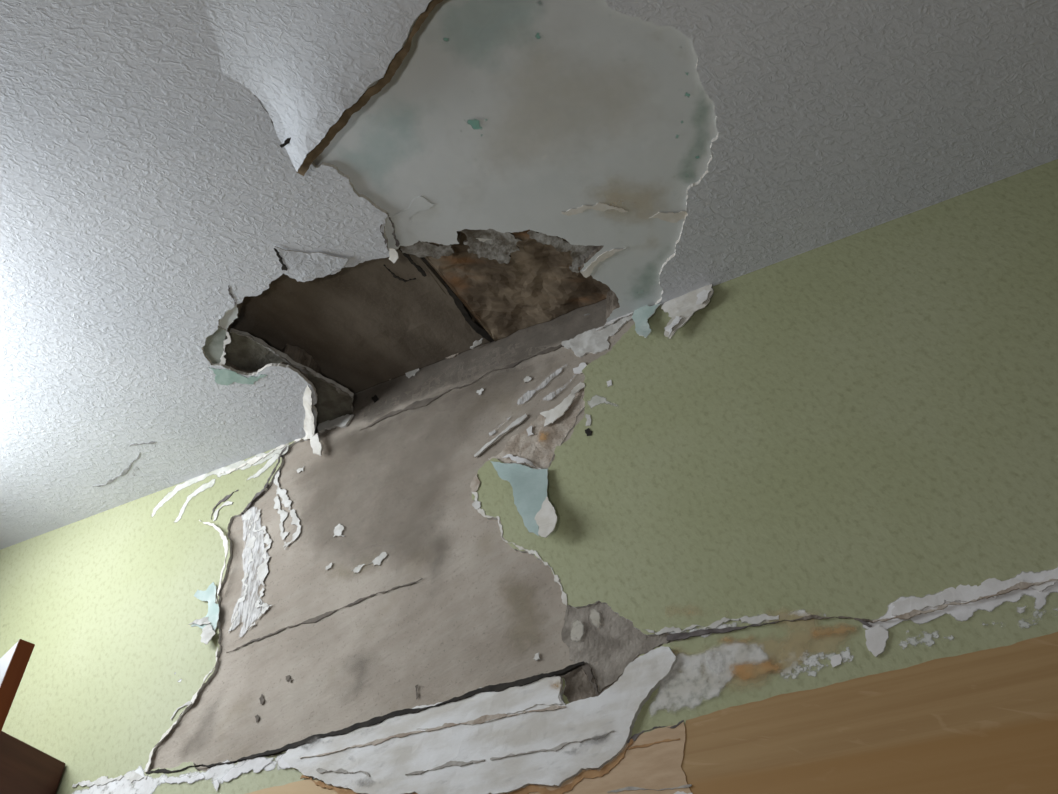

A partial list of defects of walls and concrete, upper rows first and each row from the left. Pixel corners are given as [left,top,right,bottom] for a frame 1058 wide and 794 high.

flaking render [144,0,718,772]
crack [226,578,423,653]
peeling [650,642,767,715]
leakage [646,610,847,686]
peeling [779,647,853,679]
crack [666,579,1058,641]
peeling [899,631,954,649]
crack [146,661,622,777]